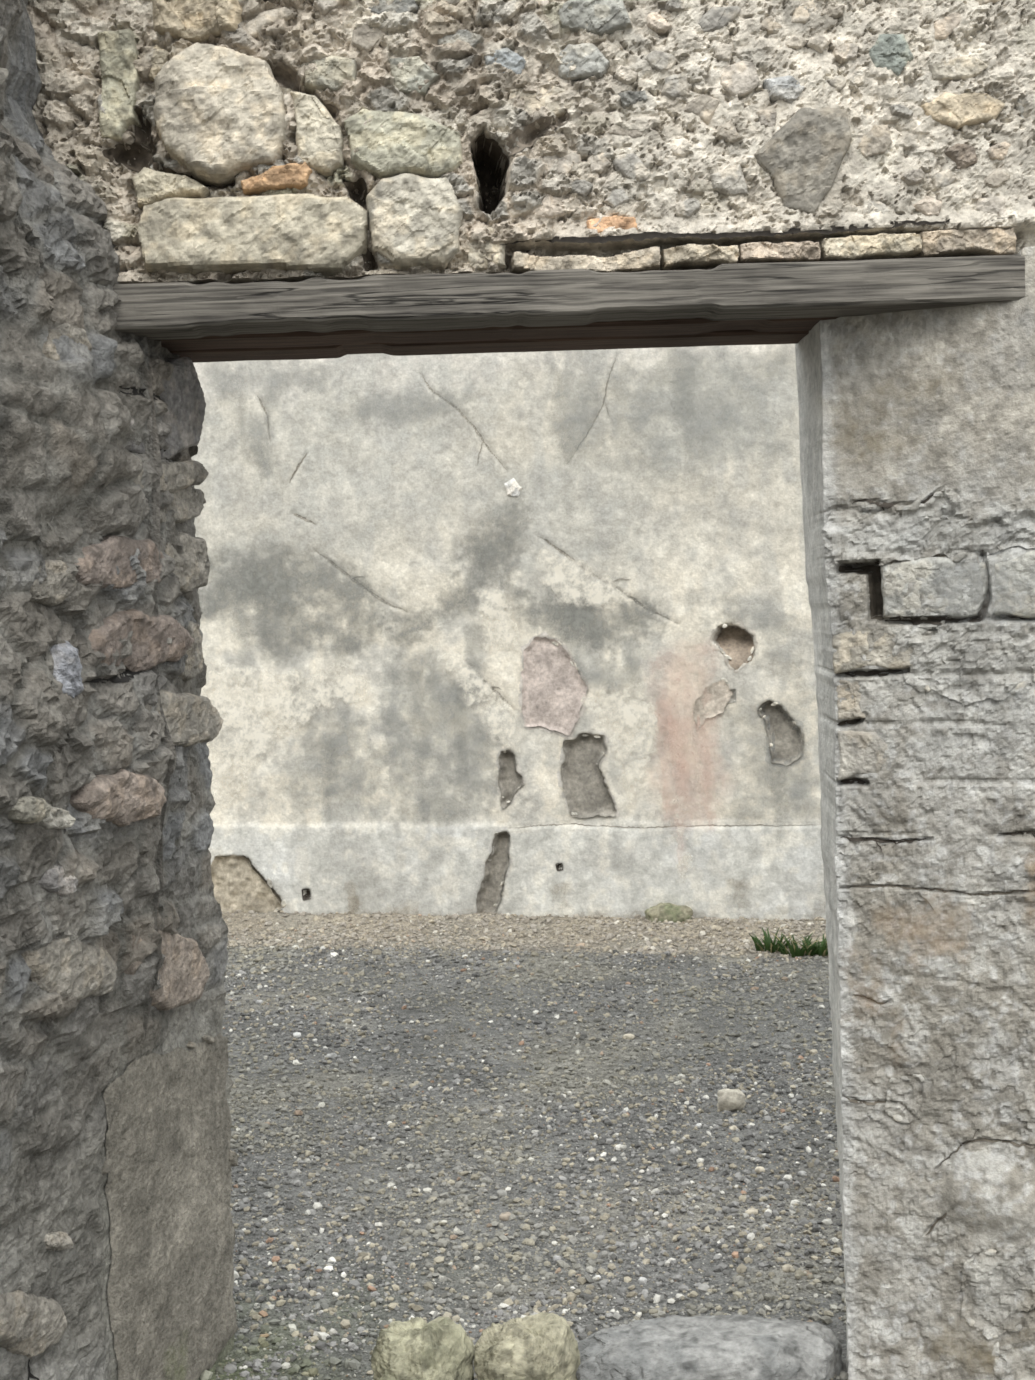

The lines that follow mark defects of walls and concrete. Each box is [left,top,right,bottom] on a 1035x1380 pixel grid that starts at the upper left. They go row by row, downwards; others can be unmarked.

spalling [693,620,758,730]
flaking render [518,631,619,819]
flaking render [756,699,807,767]
flaking render [475,747,526,914]
flaking render [211,855,311,913]
crack [842,1095,886,1106]
crack [939,1129,1035,1166]
crack [926,1212,948,1235]